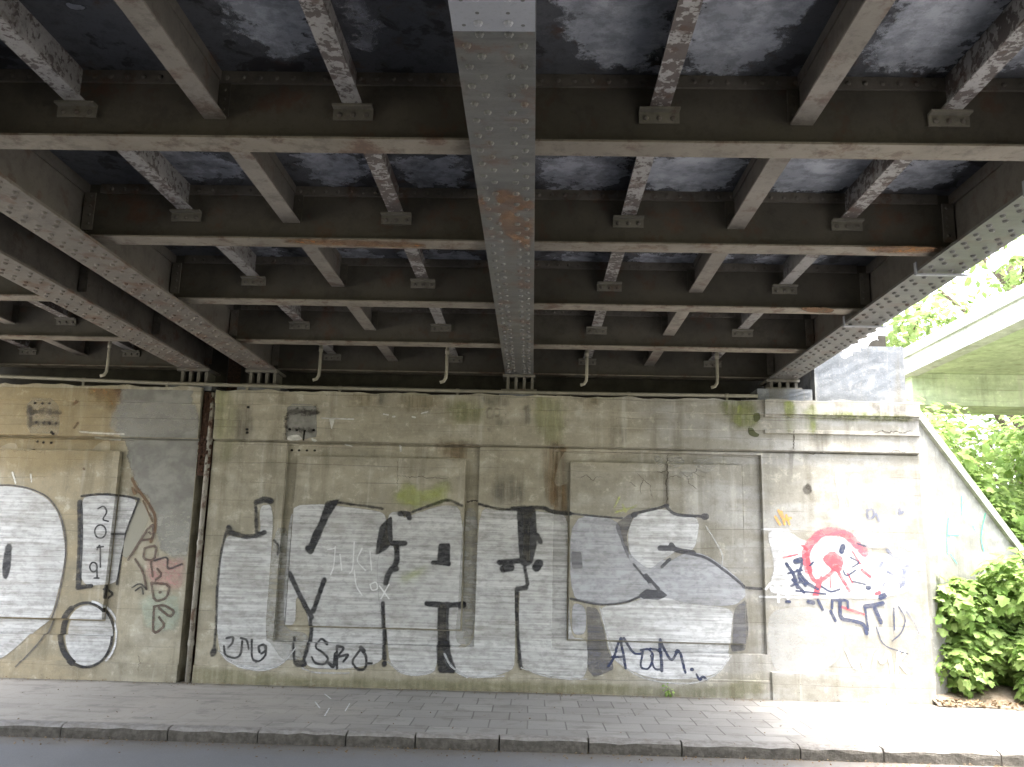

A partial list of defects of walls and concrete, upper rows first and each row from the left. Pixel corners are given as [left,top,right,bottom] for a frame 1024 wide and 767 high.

rust [197,392,216,476]
crack [630,455,703,505]